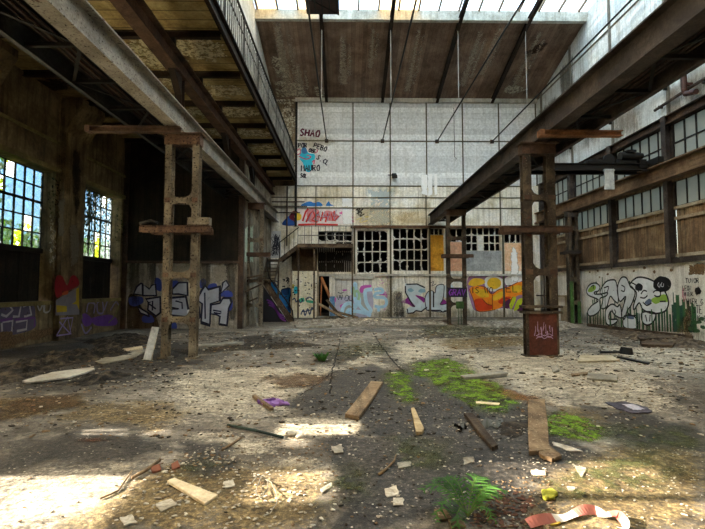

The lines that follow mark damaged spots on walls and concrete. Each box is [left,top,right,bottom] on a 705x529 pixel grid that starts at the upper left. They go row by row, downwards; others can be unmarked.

crack [300,333,405,396]